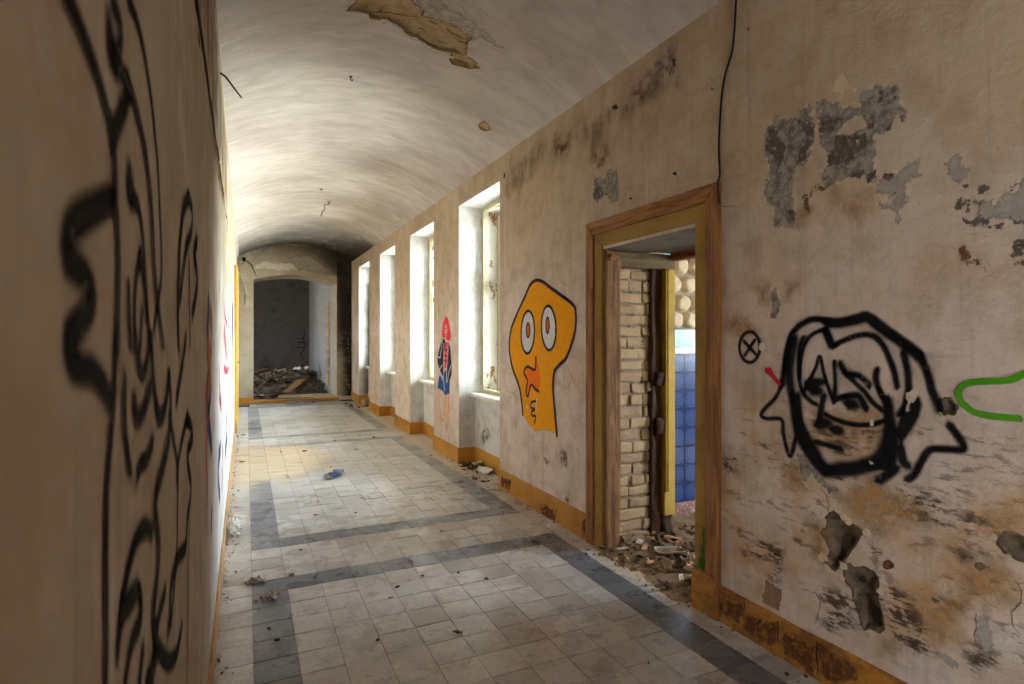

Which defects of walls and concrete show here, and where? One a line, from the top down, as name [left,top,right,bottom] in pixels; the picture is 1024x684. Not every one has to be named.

flaking render [346,0,482,71]
peeling [763,71,920,229]
peeling [944,154,1024,230]
peeling [1010,239,1024,258]
spalling [905,389,918,411]
water stain [837,477,990,533]
water stain [744,540,782,581]
flaking render [797,453,894,634]
flaking render [991,531,1024,563]
water stain [819,587,861,633]
water stain [879,587,954,652]
water stain [964,643,998,667]